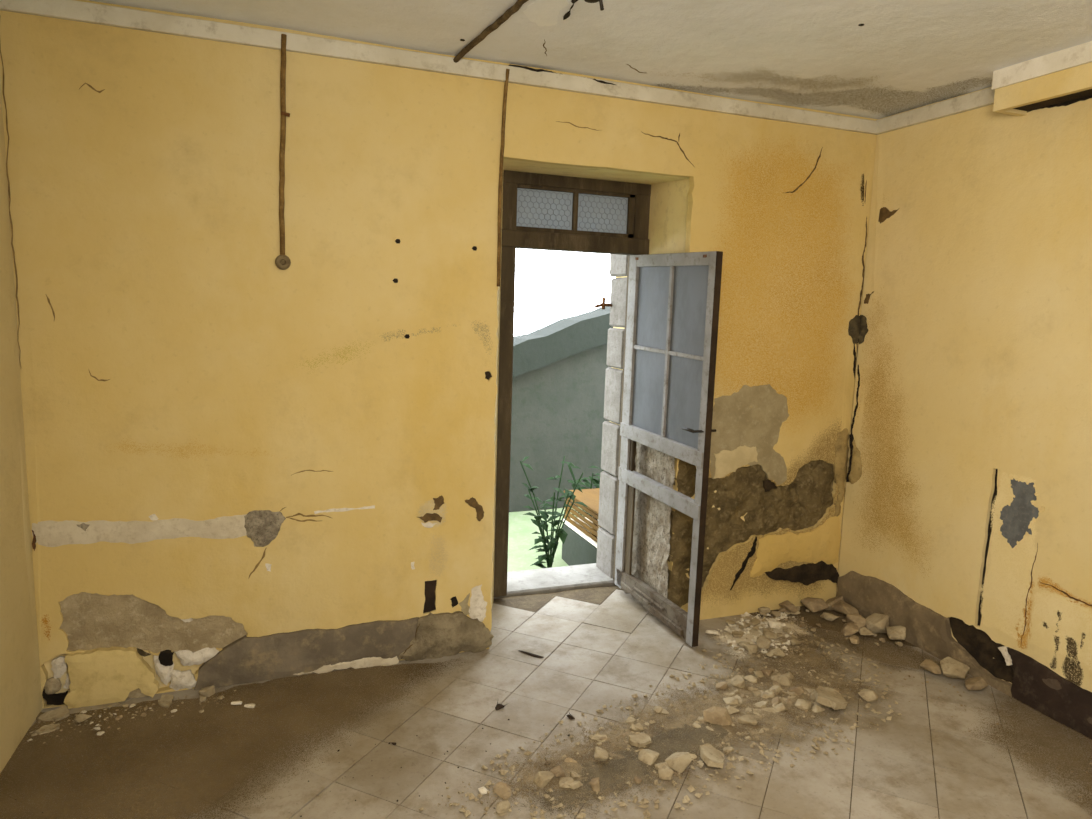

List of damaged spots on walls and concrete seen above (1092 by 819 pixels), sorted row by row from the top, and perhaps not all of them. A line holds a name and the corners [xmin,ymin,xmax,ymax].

crack [642,132,694,166]
crack [786,147,823,193]
crack [857,180,867,316]
crack [846,343,862,484]
spalling [631,384,849,608]
peeling [998,475,1045,548]
spalling [60,592,247,666]
peeling [998,646,1012,666]
spalling [42,689,68,705]